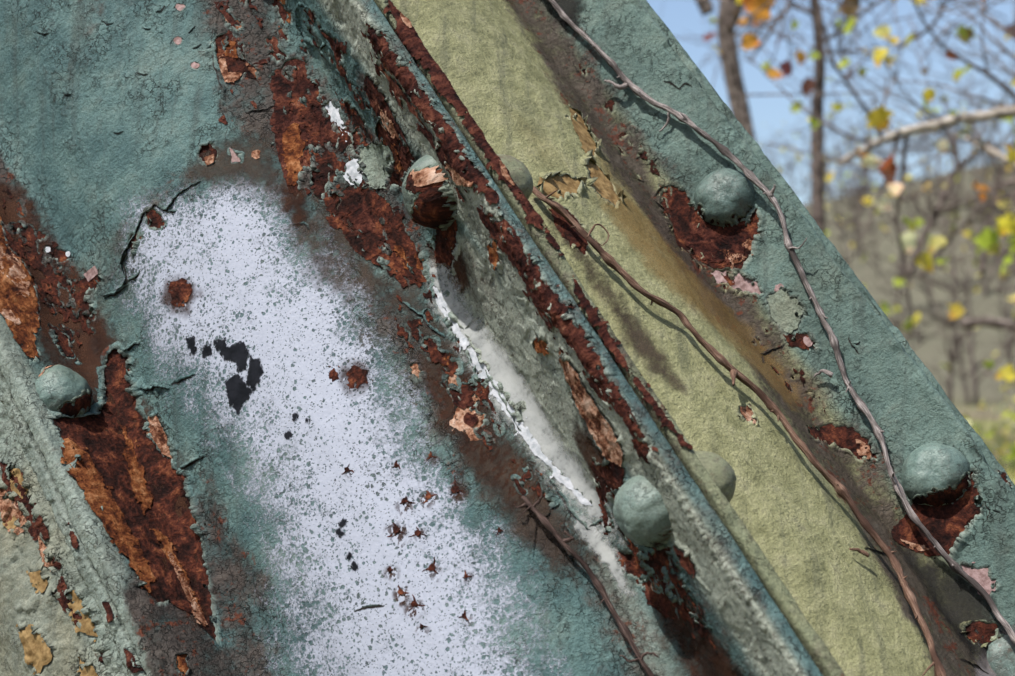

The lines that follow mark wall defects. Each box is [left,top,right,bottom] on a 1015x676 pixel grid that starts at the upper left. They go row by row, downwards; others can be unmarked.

peeling [0,217,83,380]
peeling [125,206,168,258]
peeling [162,278,194,311]
corrosion [214,0,620,510]
peeling [189,0,701,620]
corrosion [611,129,685,222]
corrosion [686,251,742,298]
corrosion [750,323,775,349]
corrosion [769,363,825,412]
peeling [0,456,61,601]
peeling [45,341,228,650]
corrosion [612,513,742,676]